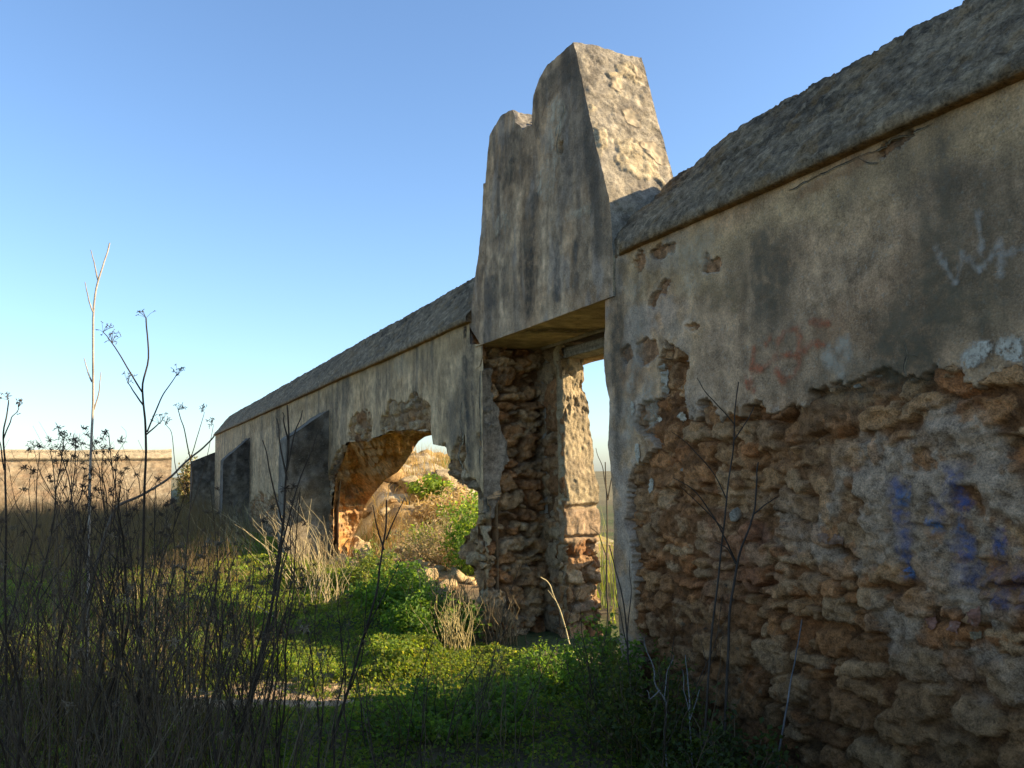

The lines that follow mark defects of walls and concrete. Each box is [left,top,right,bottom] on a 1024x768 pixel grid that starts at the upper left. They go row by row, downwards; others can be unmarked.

crack [789,123,932,191]
spalling [329,392,432,565]
spalling [630,338,1024,768]